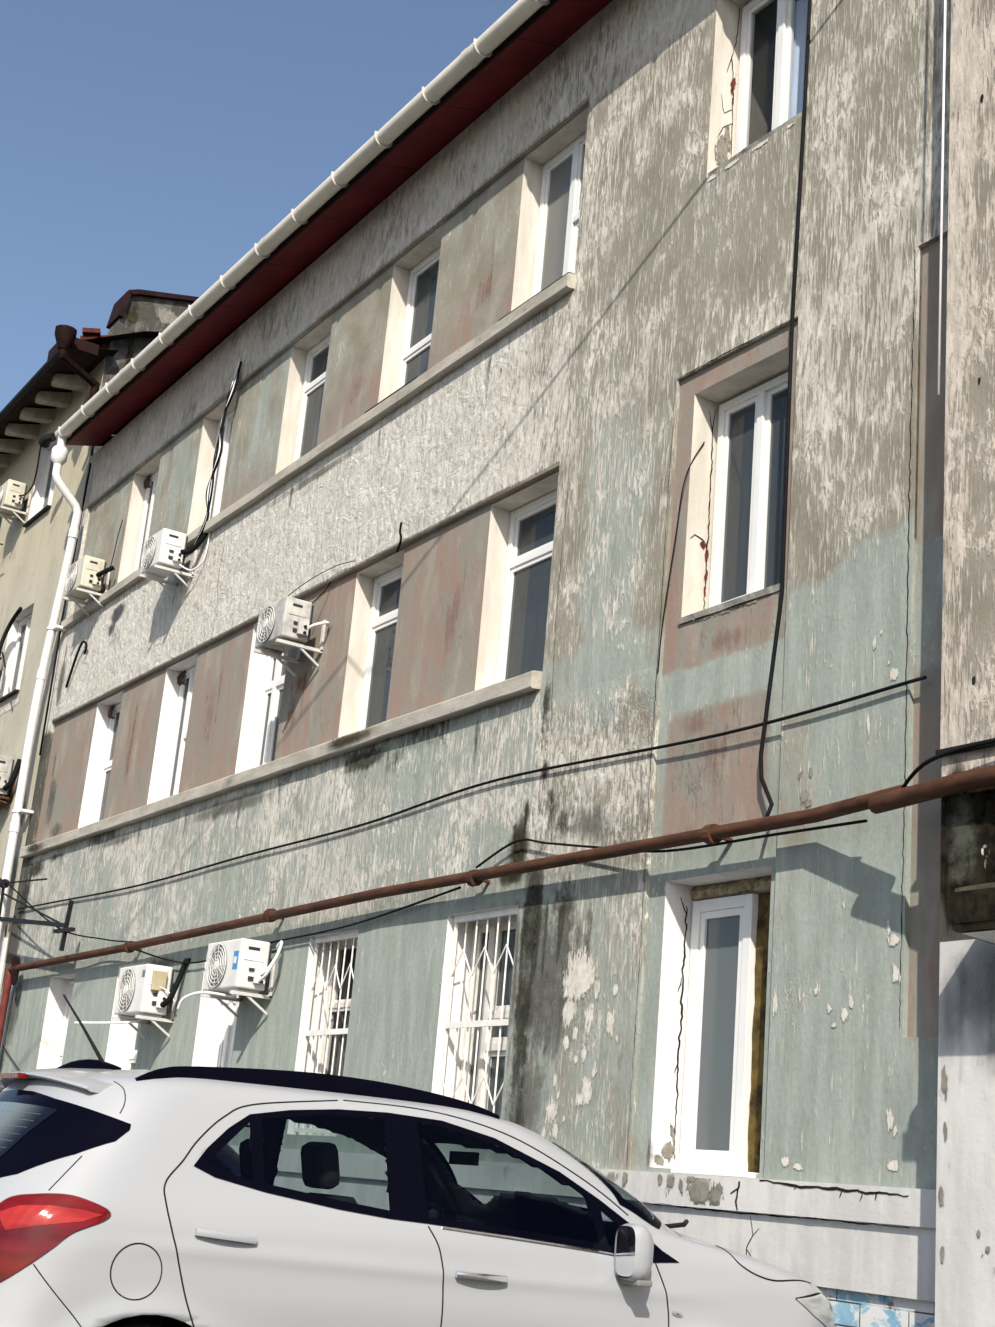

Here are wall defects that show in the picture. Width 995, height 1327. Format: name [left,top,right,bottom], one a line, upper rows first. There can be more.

crack [626,316,797,1167]
water stain [550,790,601,838]
water stain [945,791,995,924]
peeling [887,919,900,947]
water stain [510,870,573,1129]
peeling [560,917,619,1107]
peeling [814,986,854,1028]
peeling [541,1074,565,1141]
peeling [885,1105,898,1138]
flaking render [654,1122,724,1211]
peeling [887,1160,898,1172]
crack [627,1179,909,1256]